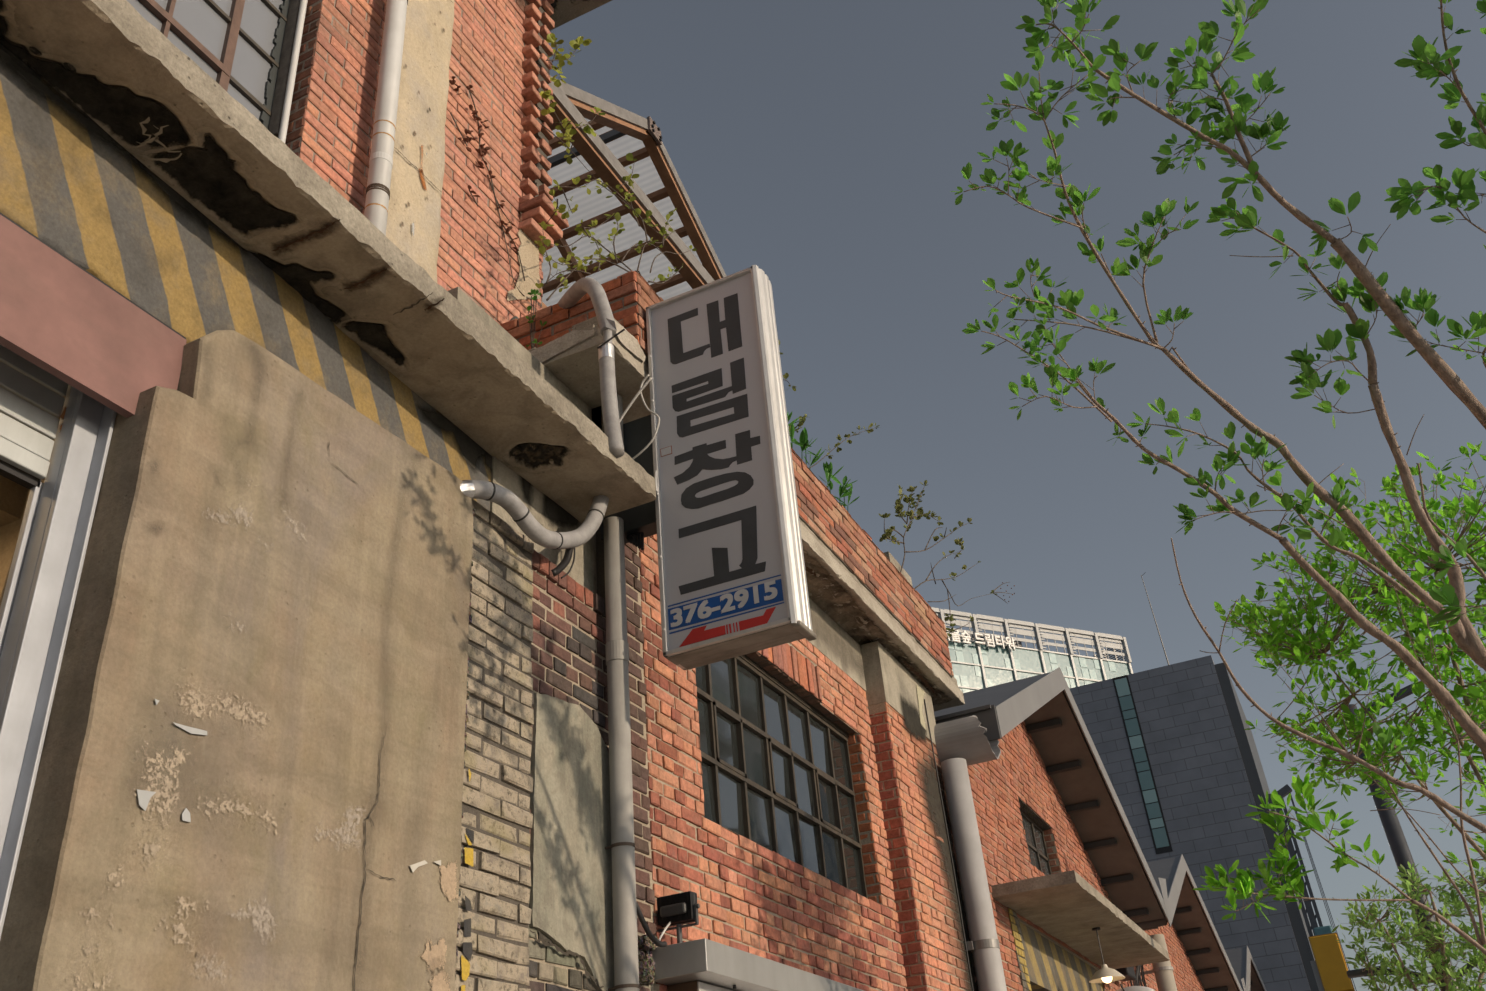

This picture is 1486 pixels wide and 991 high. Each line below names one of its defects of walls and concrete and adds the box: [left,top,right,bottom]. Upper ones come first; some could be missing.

spalling [0,2,405,365]
spalling [509,443,567,469]
peeling [66,683,279,991]
crack [354,721,396,991]
peeling [418,658,474,991]